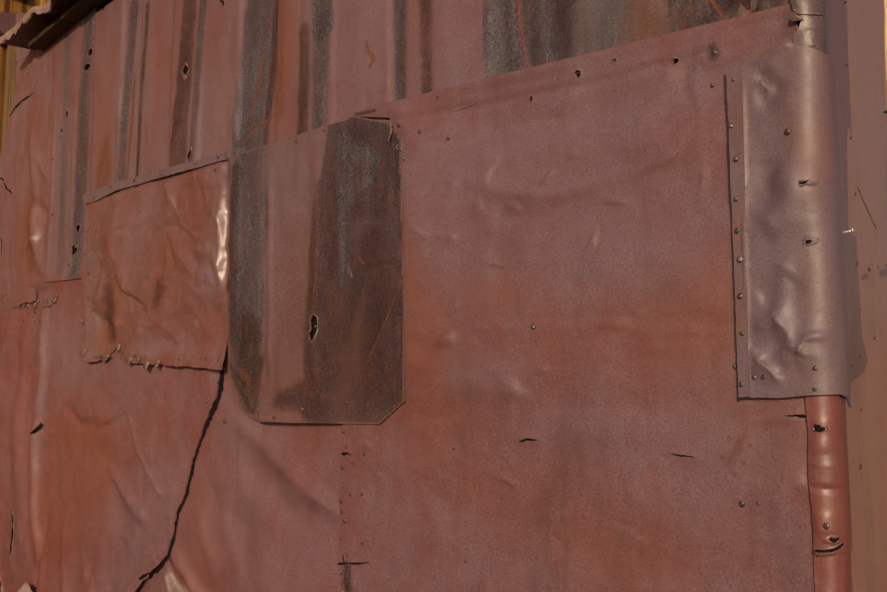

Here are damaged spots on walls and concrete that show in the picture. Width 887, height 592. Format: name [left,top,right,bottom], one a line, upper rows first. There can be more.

corrosion [170,0,196,165]
corrosion [274,181,322,421]
crack [148,370,224,578]